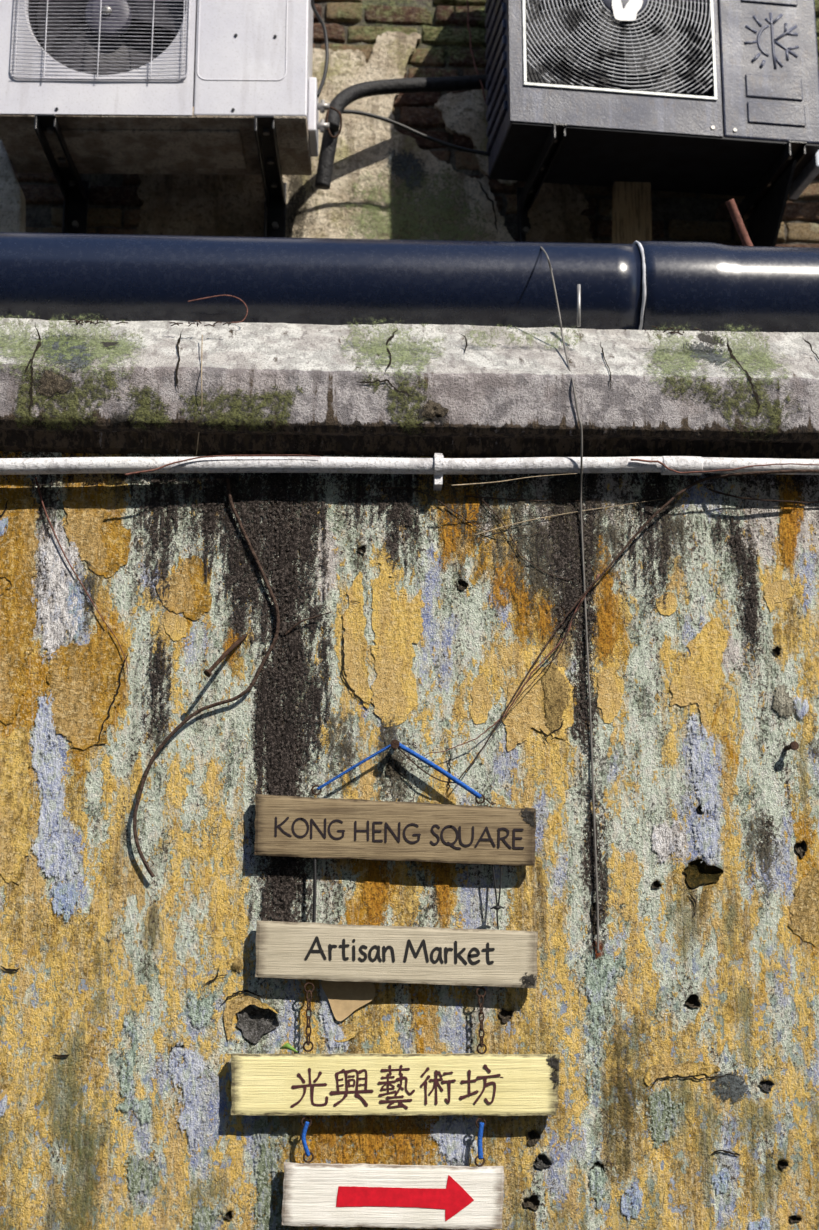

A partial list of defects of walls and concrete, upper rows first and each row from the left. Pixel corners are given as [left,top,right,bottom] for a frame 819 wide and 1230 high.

peeling [612,0,643,21]
crack [25,322,41,411]
damp [32,331,118,401]
crack [175,331,183,390]
damp [683,331,732,367]
crack [727,338,760,415]
damp [712,506,761,661]
peeling [342,552,424,727]
peeling [0,491,131,926]
damp [130,473,696,975]
peeling [647,617,729,888]
crack [650,1073,736,1088]